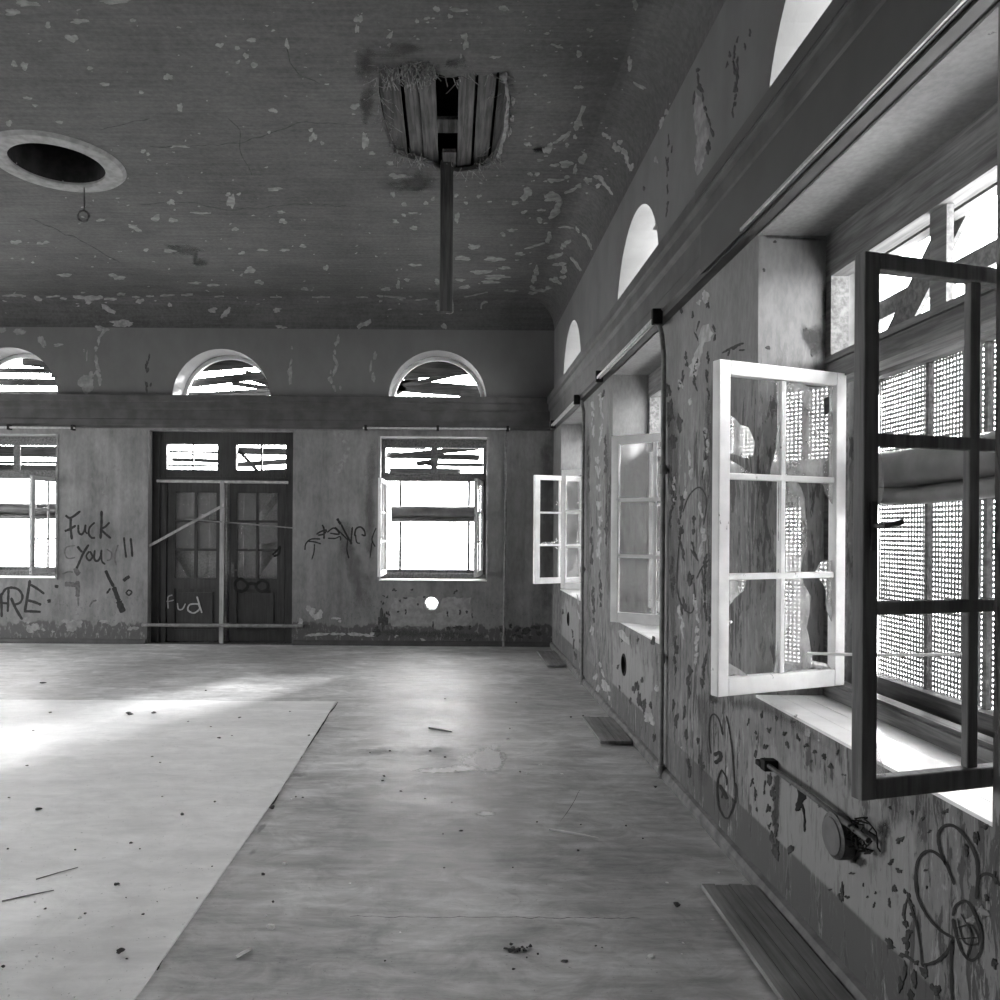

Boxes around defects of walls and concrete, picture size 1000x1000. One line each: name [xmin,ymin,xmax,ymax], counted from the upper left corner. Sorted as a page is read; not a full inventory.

spalling [350,61,521,182]
peeling [692,68,715,175]
peeling [357,105,613,329]
peeling [666,290,716,449]
peeling [587,390,611,635]
peeling [298,588,473,641]
peeling [668,427,711,778]
peeling [593,662,659,742]
peeling [747,710,846,776]
peeling [750,772,794,861]
flaking render [790,784,807,832]
peeling [885,859,942,1000]